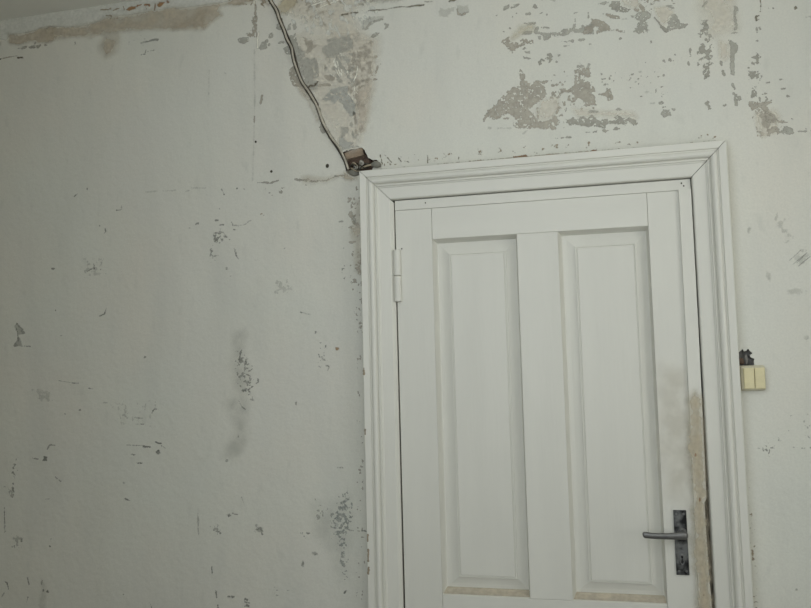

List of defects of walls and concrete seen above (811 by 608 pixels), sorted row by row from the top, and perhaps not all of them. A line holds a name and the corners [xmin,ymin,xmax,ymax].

peeling [238,0,378,175]
peeling [483,63,638,139]
peeling [496,0,688,65]
peeling [687,6,807,136]